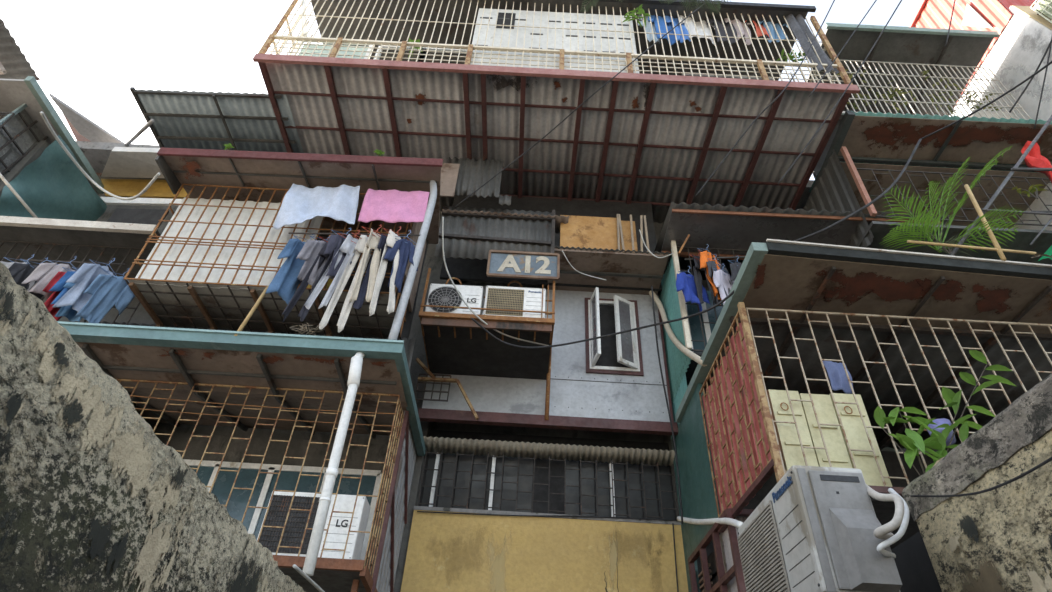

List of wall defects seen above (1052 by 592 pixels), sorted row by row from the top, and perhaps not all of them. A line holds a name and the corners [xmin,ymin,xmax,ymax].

corrosion [854,118,1052,150]
corrosion [815,268,1017,315]
leakage [0,382,23,446]
leakage [57,395,84,428]
leakage [79,510,129,575]
crack [604,524,619,592]
leakage [961,554,1007,592]